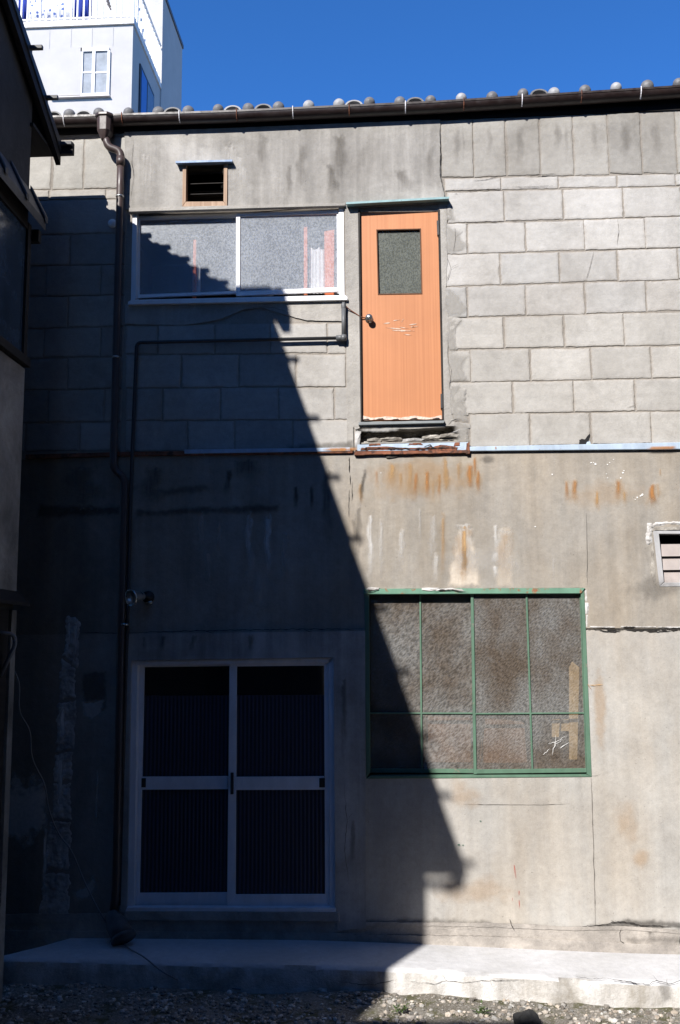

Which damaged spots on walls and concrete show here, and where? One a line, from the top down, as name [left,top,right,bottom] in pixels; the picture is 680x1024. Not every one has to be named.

spalling [354,418,470,459]
leakage [450,524,479,586]
crack [588,625,680,633]